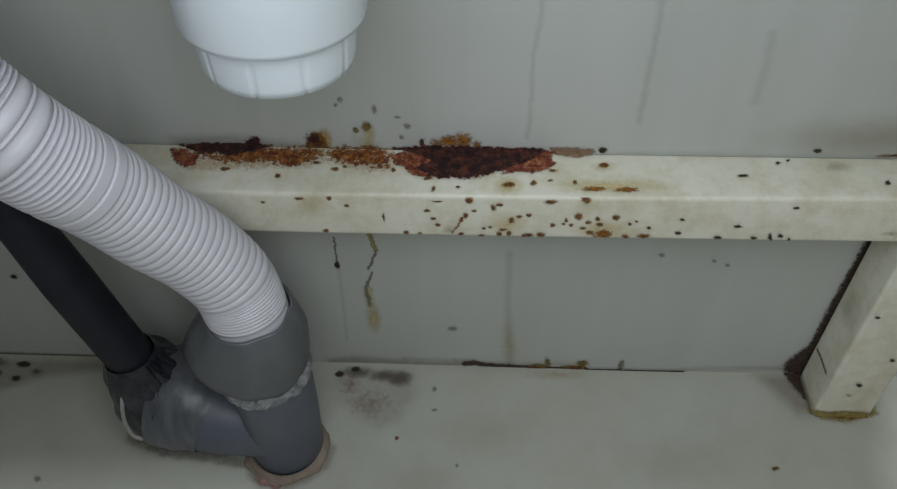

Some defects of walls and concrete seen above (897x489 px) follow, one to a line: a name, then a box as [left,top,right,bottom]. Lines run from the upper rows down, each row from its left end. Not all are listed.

rust [169,116,608,227]
rust [573,180,637,204]
rust [451,198,476,235]
rust [478,214,532,236]
rust [522,214,611,238]
rust [613,215,651,238]
rust [365,233,378,324]
damp [0,353,97,381]
damp [379,372,407,383]
rust [462,360,588,370]